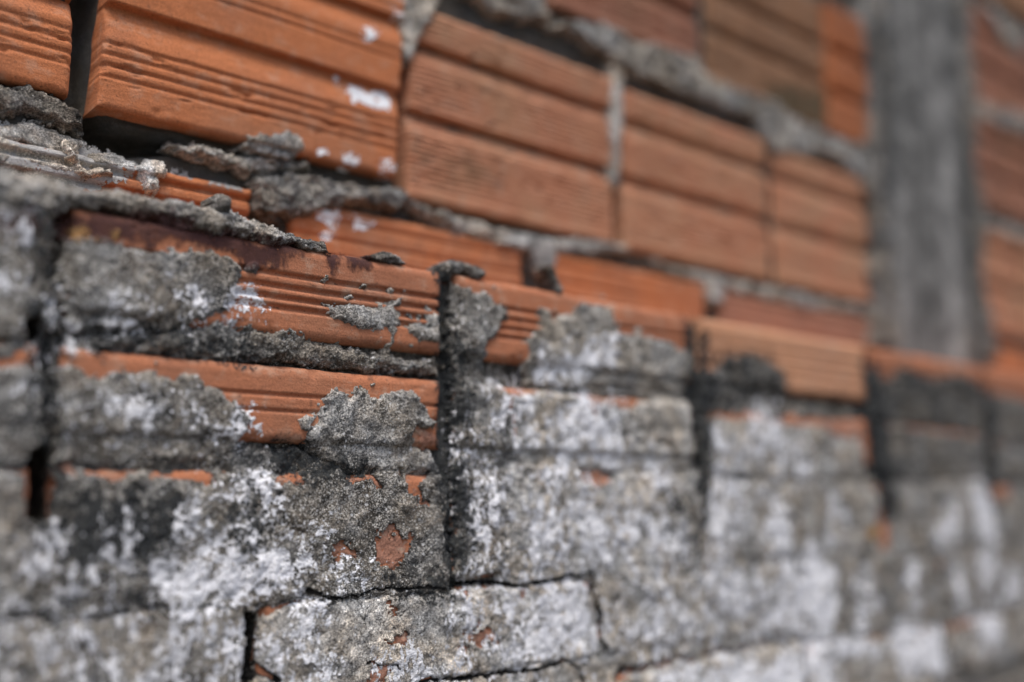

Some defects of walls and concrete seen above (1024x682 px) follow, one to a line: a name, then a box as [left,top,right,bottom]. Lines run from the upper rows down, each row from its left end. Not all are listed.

peeling [0,201,260,346]
damp [0,197,949,682]
peeling [0,280,1024,682]
crack [240,611,282,682]
crack [305,569,628,682]